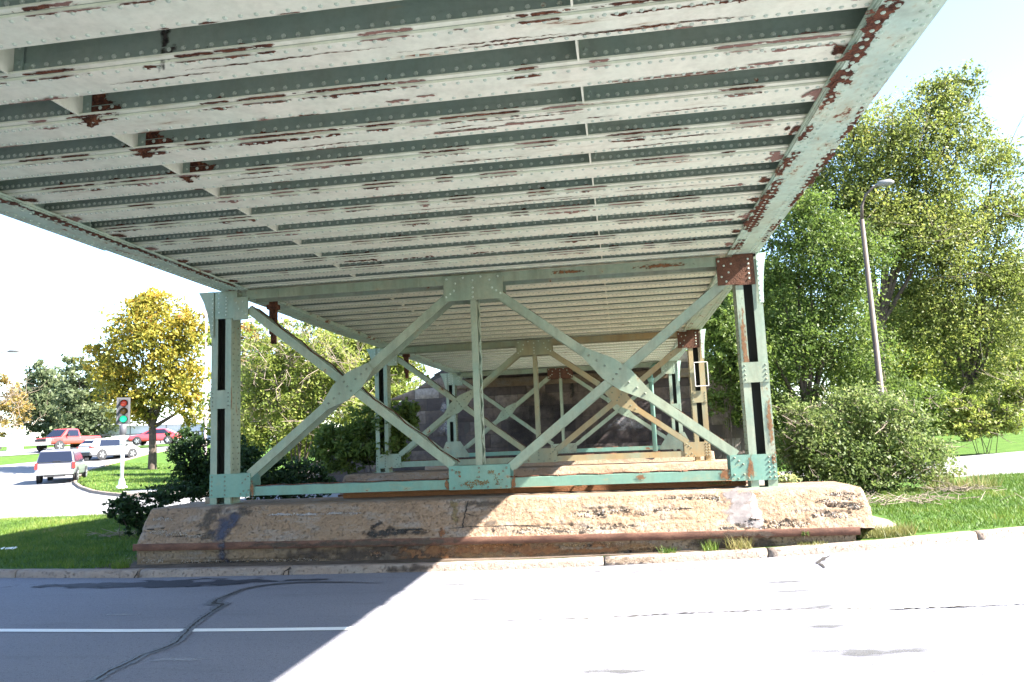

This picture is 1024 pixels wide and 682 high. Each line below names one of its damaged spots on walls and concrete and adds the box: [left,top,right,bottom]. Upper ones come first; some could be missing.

corrosion [12,28,435,128]
corrosion [504,64,539,80]
corrosion [397,0,753,53]
corrosion [602,0,905,105]
corrosion [0,130,238,288]
corrosion [225,100,583,197]
corrosion [490,82,813,255]
corrosion [788,106,864,210]
corrosion [739,308,748,362]
water stain [197,505,252,563]
water stain [254,522,457,572]
corrosion [399,528,668,559]